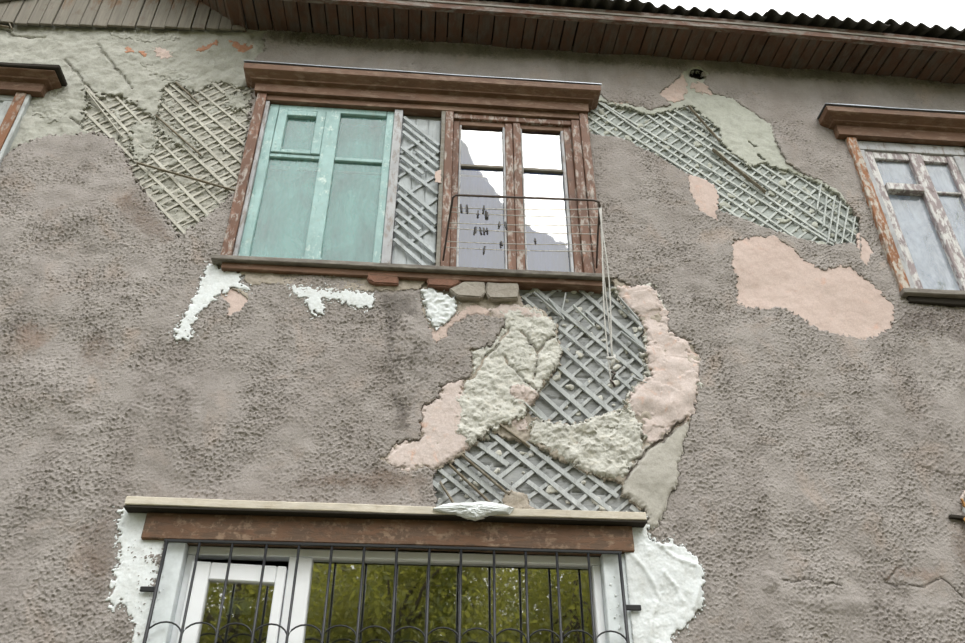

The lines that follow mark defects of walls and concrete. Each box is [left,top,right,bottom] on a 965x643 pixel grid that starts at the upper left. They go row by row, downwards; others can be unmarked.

flaking render [0,16,273,238]
peeling [219,271,297,315]
flaking render [588,66,895,342]
flaking render [326,277,704,532]
crack [884,565,965,599]
flaking render [948,490,965,522]